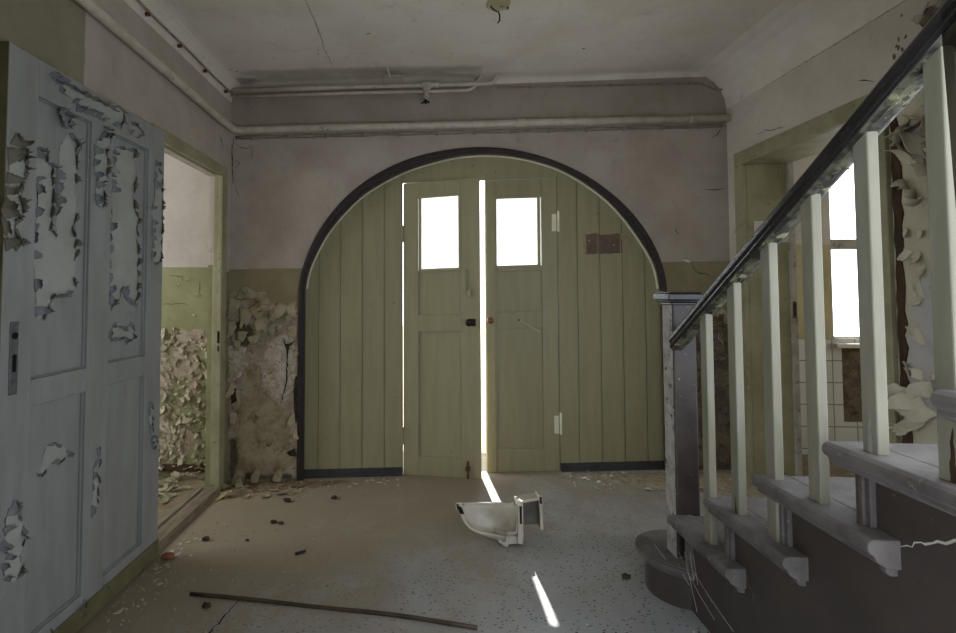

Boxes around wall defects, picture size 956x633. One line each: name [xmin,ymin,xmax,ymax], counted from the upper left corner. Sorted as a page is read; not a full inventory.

peeling [900,0,945,27]
peeling [883,104,927,177]
peeling [0,72,166,321]
peeling [890,178,928,207]
peeling [887,227,937,436]
peeling [148,327,207,471]
peeling [225,287,299,482]
crack [280,341,295,404]
peeling [37,442,75,479]
peeling [0,500,32,582]
crack [900,539,956,548]